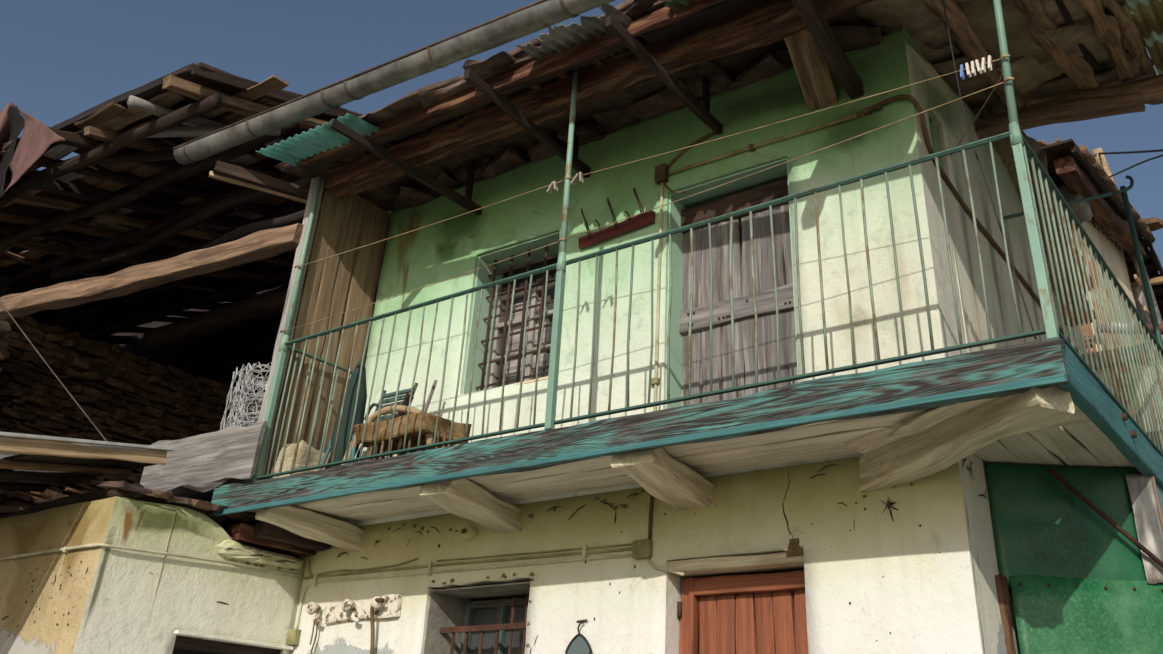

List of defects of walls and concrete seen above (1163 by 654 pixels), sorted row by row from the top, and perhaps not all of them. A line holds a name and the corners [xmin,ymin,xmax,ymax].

crack [783,471,794,539]